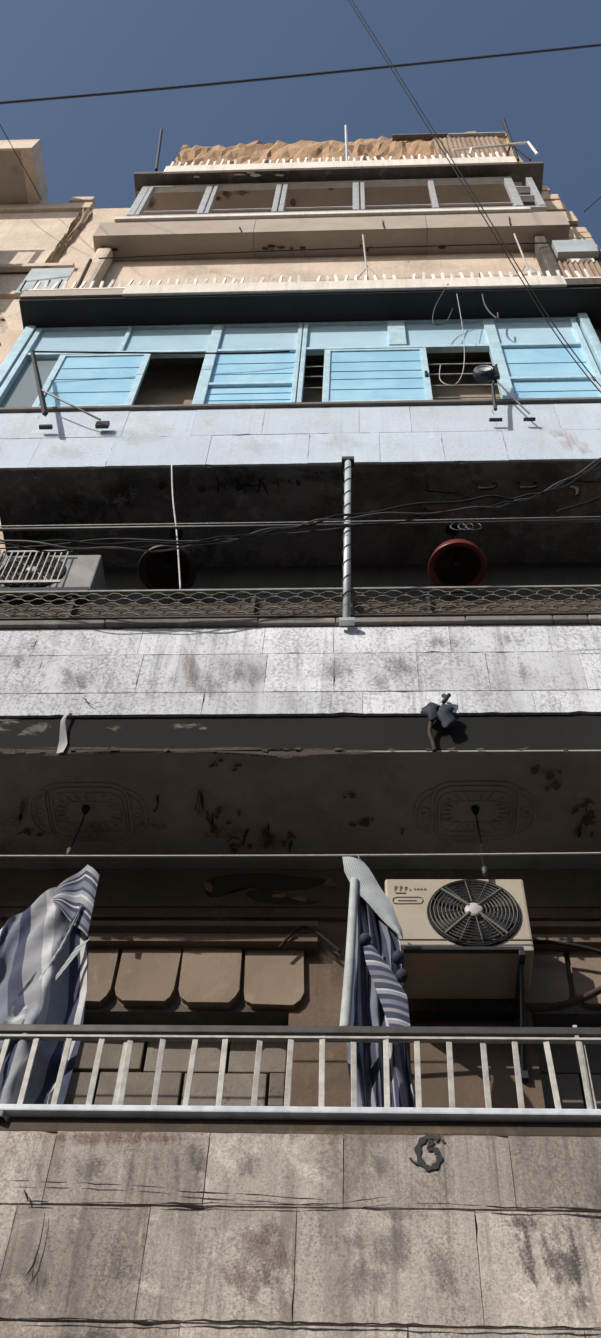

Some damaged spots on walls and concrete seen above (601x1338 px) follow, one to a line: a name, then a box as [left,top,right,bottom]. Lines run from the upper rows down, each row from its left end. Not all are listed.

crack [9,1180,384,1281]
crack [415,1203,601,1212]
leakage [506,1214,593,1304]
crack [18,1317,601,1330]